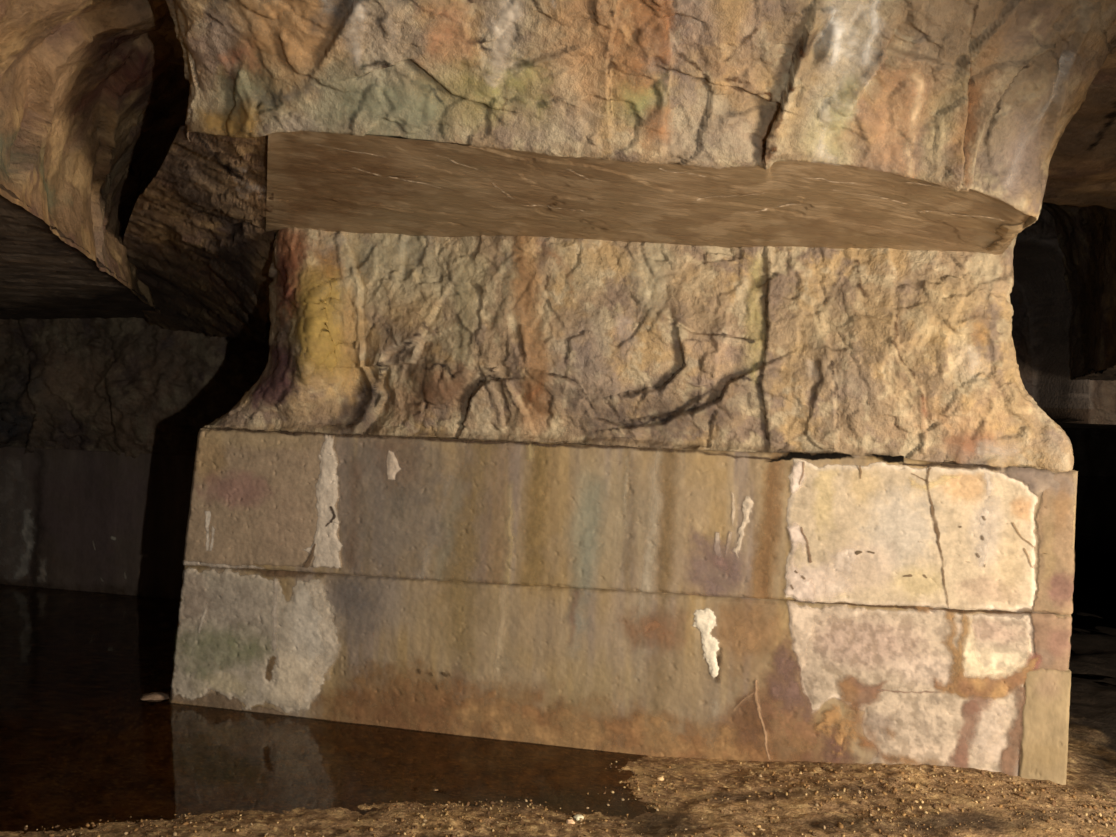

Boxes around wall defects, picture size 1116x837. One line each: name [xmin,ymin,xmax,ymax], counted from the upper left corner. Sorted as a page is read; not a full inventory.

crack [361,61,443,102]
crack [468,39,492,52]
crack [664,4,702,96]
crack [727,28,805,160]
crack [211,261,1035,614]
flaking render [170,429,343,718]
damp [638,452,675,623]
damp [693,461,780,599]
damp [324,630,777,762]
flaking render [693,608,722,681]
rust [935,611,1039,776]